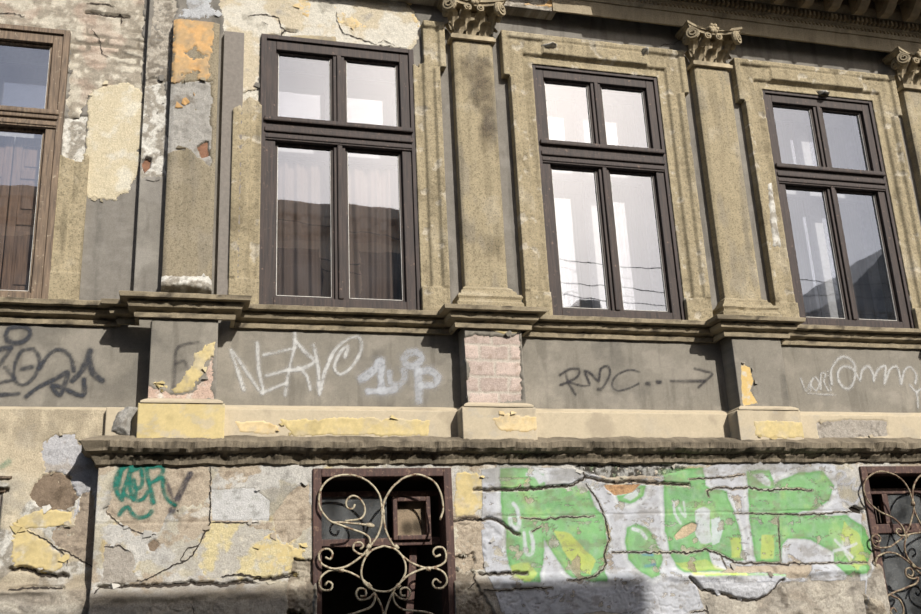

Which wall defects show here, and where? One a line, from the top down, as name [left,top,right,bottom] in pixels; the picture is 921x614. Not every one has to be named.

crack [249,14,296,36]
crack [336,12,402,48]
flaking render [0,0,421,202]
peeling [235,415,430,437]
flaking render [10,431,318,614]
crack [453,470,868,614]
peeling [689,563,812,601]